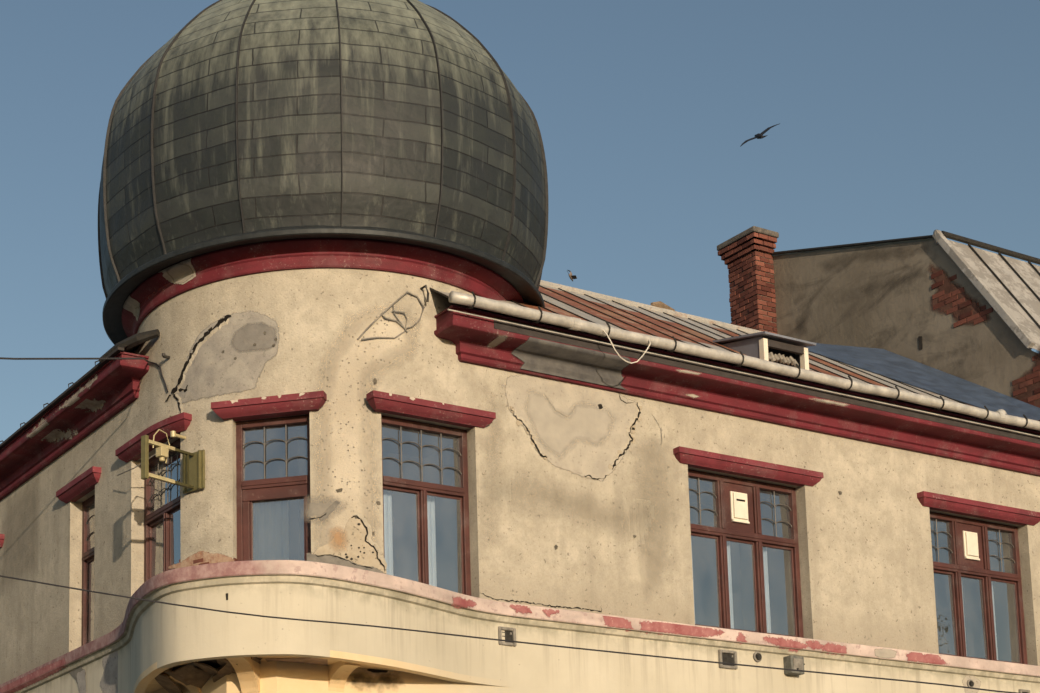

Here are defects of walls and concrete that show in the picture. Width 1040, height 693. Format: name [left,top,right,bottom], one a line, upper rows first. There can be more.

peeling [158,259,196,285]
flaking render [930,265,993,328]
flaking render [1012,347,1040,421]
spalling [307,513,387,574]
peeling [451,596,477,609]
peeling [510,605,560,618]
peeling [603,616,725,639]
peeling [763,635,847,656]
peeling [906,652,945,665]